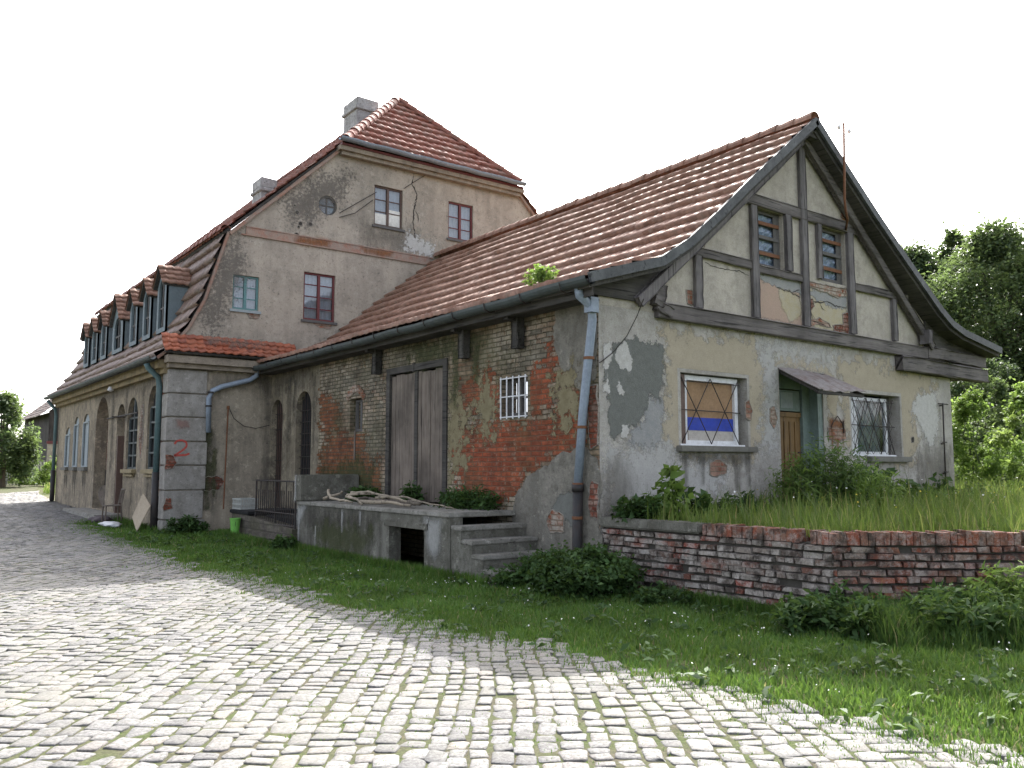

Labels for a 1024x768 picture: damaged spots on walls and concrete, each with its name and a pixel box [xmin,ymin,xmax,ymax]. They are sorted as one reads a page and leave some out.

crack [411,175,419,251]
flaking render [401,225,436,257]
peeling [760,274,849,334]
flaking render [316,335,450,492]
peeling [448,305,941,554]